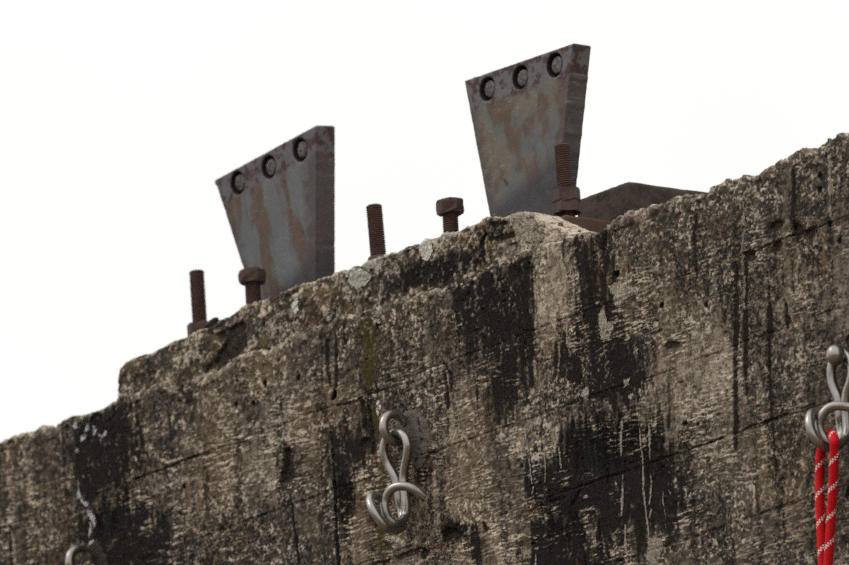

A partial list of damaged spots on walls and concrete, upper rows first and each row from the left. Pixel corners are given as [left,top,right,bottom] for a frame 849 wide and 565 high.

water stain [395,219,538,424]
water stain [522,227,693,565]
water stain [733,202,748,450]
water stain [767,285,776,477]
water stain [440,518,484,565]